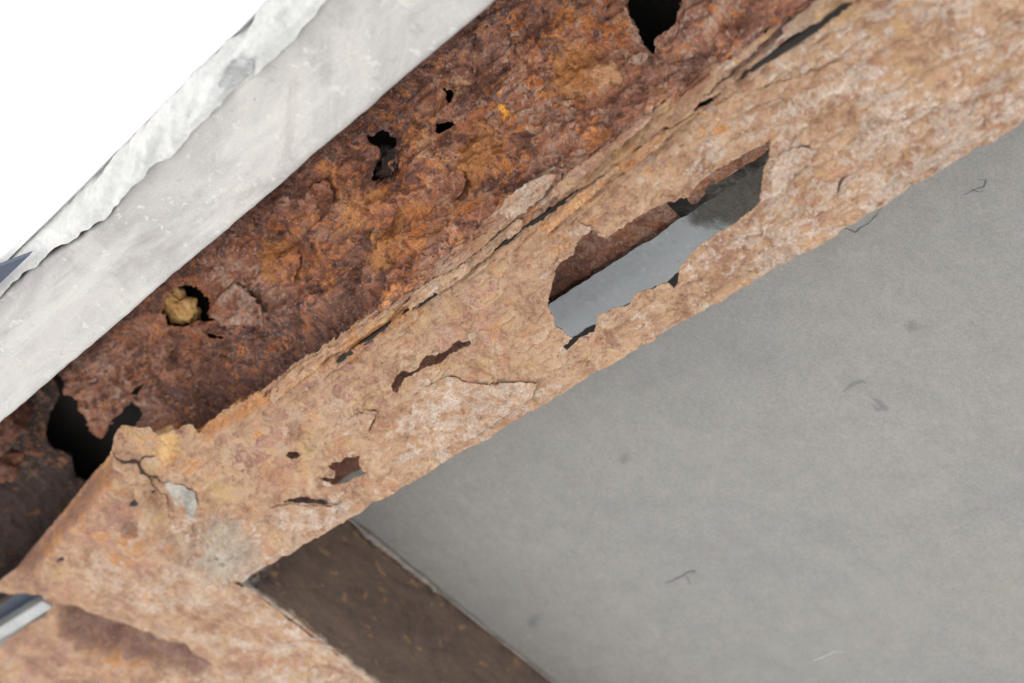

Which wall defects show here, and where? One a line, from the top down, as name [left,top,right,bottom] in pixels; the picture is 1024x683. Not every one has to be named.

corrosion [549,44,625,100]
corrosion [496,104,510,121]
corrosion [365,145,400,208]
corrosion [457,123,502,191]
corrosion [367,200,434,274]
peeling [270,114,697,404]
corrosion [195,385,280,443]
corrosion [157,431,179,463]
crack [114,454,174,512]